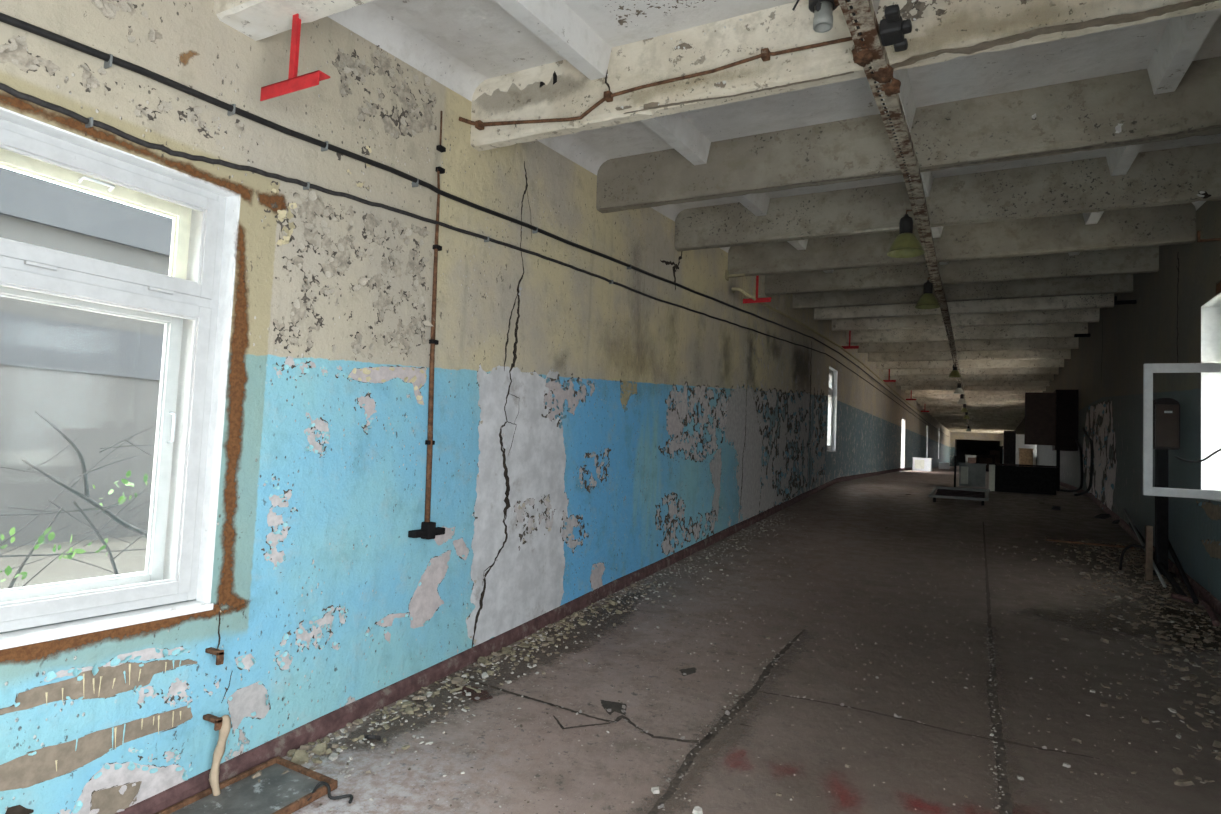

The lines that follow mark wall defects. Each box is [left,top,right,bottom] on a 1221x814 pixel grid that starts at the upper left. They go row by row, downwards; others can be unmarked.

spalling [615,71,854,114]
spalling [890,0,1219,69]
peeling [264,181,433,435]
crack [660,251,682,290]
peeling [365,363,611,646]
crack [472,161,532,647]
peeling [655,381,828,555]
peeling [0,646,271,814]
peeling [275,604,348,670]
crack [462,522,1100,814]